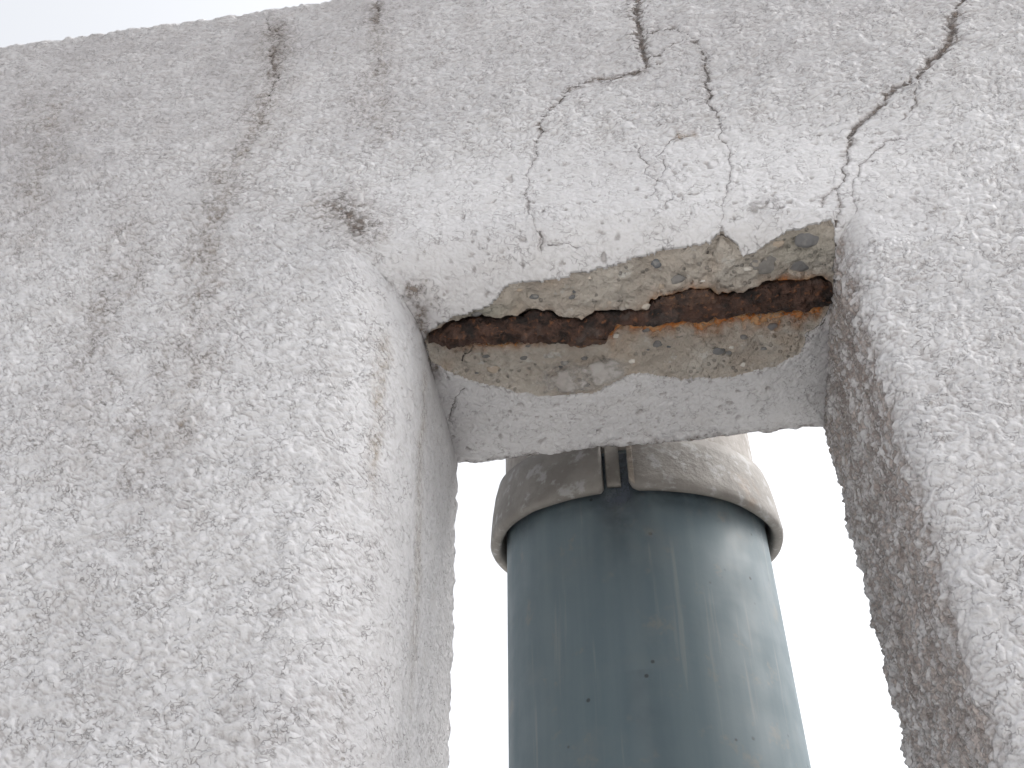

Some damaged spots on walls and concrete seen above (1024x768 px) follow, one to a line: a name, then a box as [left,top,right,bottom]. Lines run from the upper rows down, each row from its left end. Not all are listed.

crack [538,0,713,134]
crack [842,0,965,172]
spalling [425,220,836,397]
corrosion [560,288,821,348]